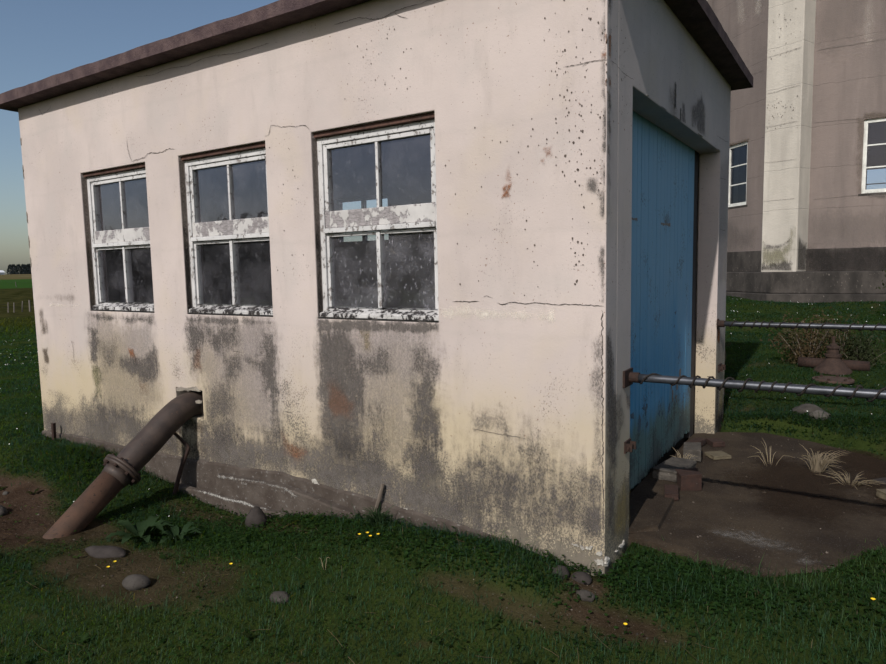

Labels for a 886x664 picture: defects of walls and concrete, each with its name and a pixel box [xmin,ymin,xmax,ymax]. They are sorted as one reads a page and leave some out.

leakage [46,177,158,446]
leakage [162,138,498,532]
crack [453,295,604,532]
leakage [468,447,615,534]
leakage [595,335,630,468]